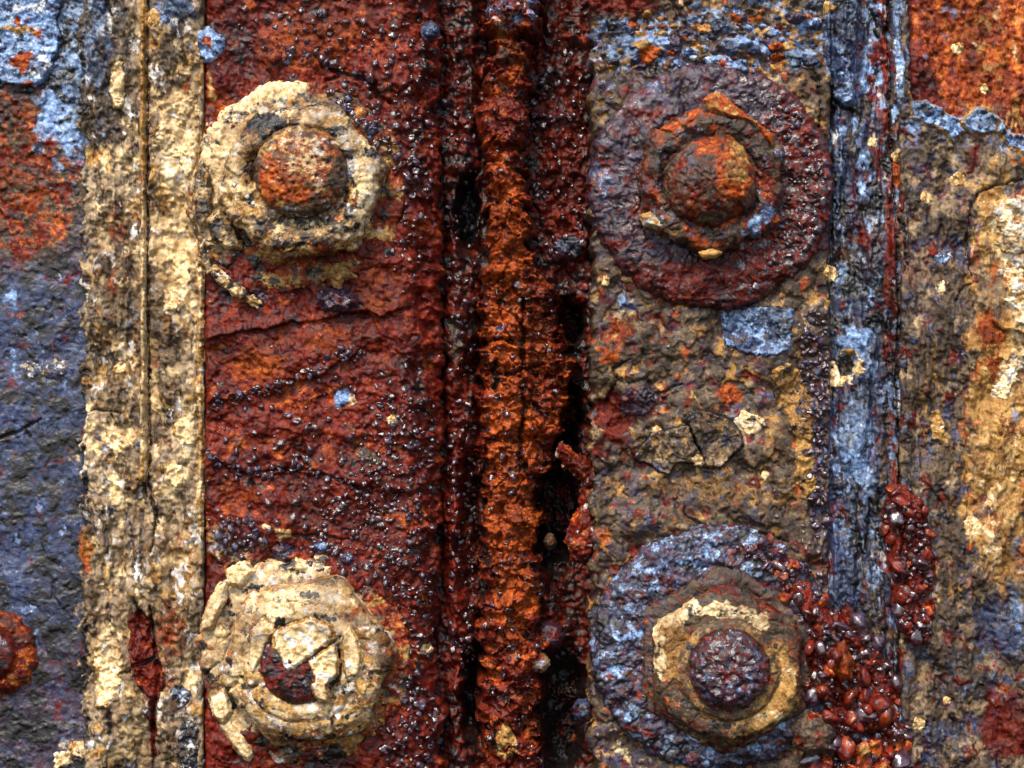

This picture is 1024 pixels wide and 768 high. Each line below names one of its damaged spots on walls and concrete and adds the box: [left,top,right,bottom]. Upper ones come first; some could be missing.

corrosion [660,92,828,273]
corrosion [639,211,679,240]
corrosion [205,6,587,768]
peeling [198,560,257,633]
peeling [248,617,363,704]
peeling [210,687,255,762]
corrosion [572,698,593,723]